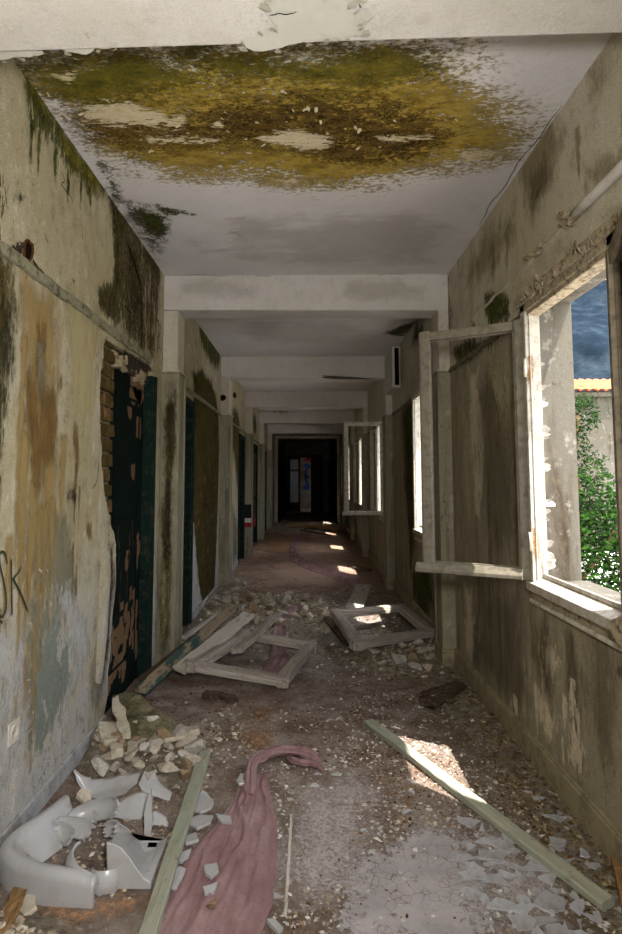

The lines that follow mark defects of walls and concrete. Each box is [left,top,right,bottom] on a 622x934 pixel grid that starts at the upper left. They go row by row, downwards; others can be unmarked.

peeling [239,0,374,53]
leakage [25,79,196,359]
leakage [0,260,18,456]
flaking render [100,339,151,523]
leakage [0,510,90,787]
leakage [103,546,115,671]
spalling [107,586,138,740]
peeling [116,533,140,571]